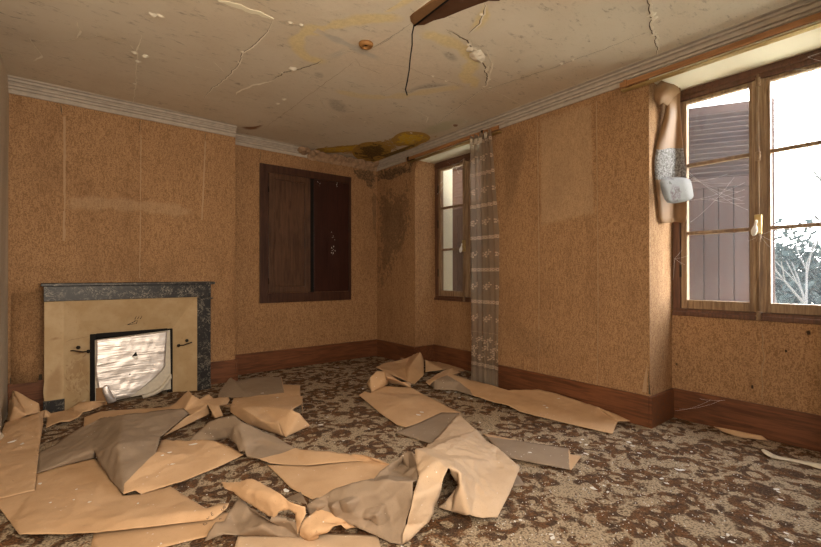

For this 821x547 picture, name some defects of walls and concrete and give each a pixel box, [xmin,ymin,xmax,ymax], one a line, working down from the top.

leakage [285,0,493,114]
crack [432,0,660,128]
leakage [309,117,473,298]
peeling [653,80,694,223]